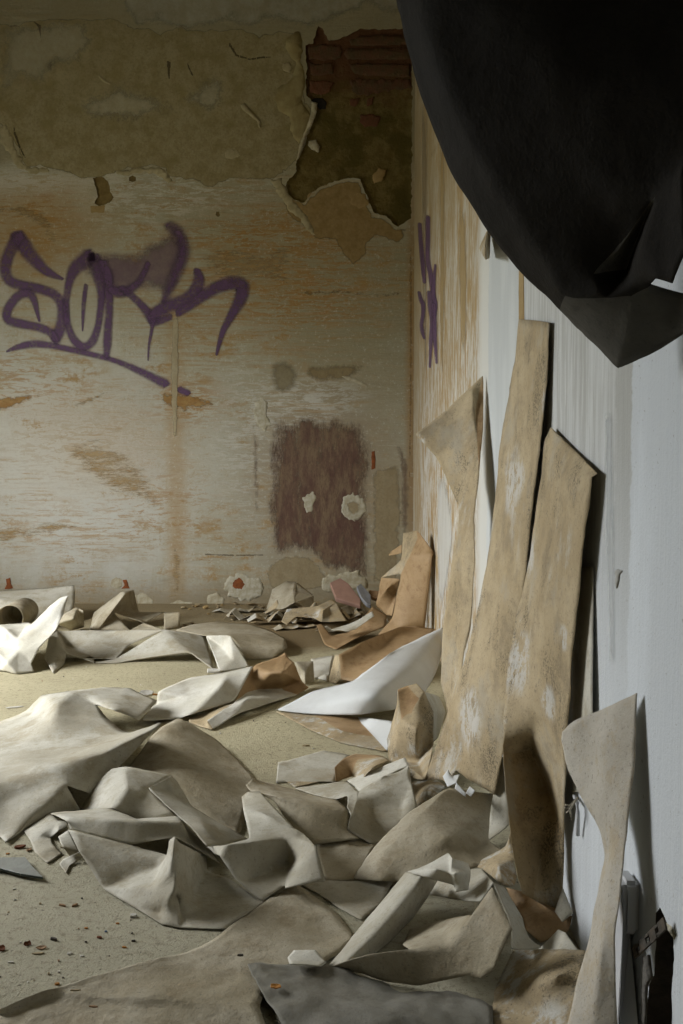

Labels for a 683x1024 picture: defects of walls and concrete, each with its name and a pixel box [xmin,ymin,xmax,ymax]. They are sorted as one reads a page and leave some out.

peeling [0,19,413,264]